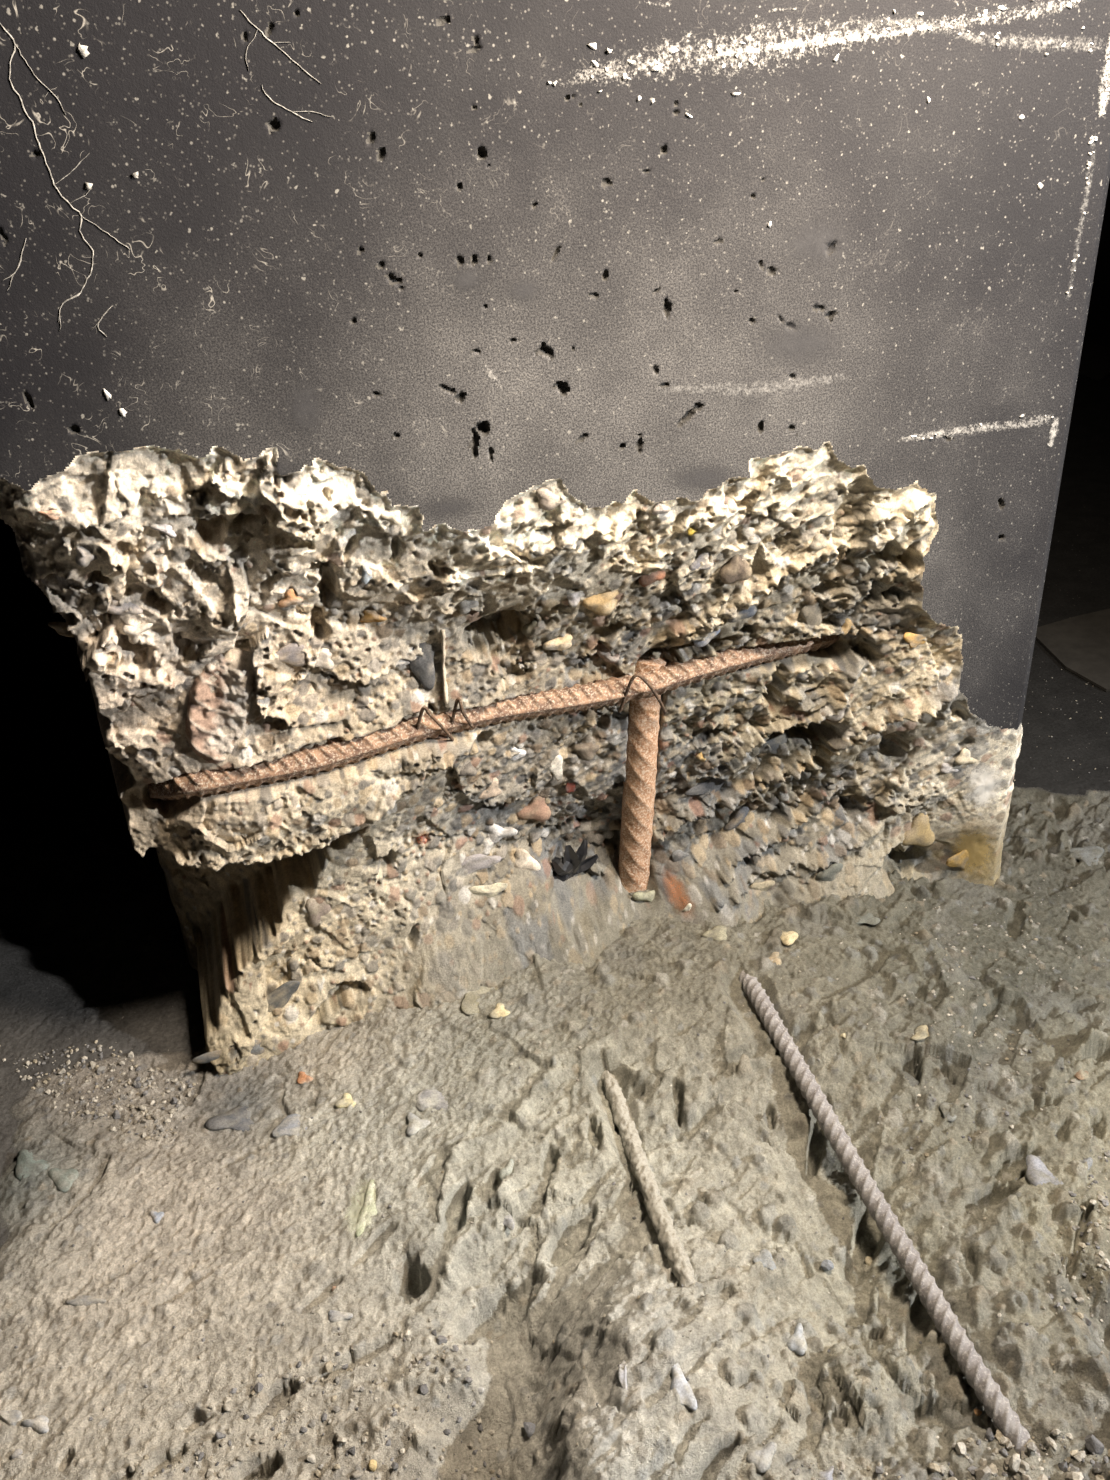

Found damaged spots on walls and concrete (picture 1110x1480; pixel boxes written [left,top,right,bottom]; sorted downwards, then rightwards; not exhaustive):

spalling [677,402,705,428]
spalling [0,424,1110,1480]